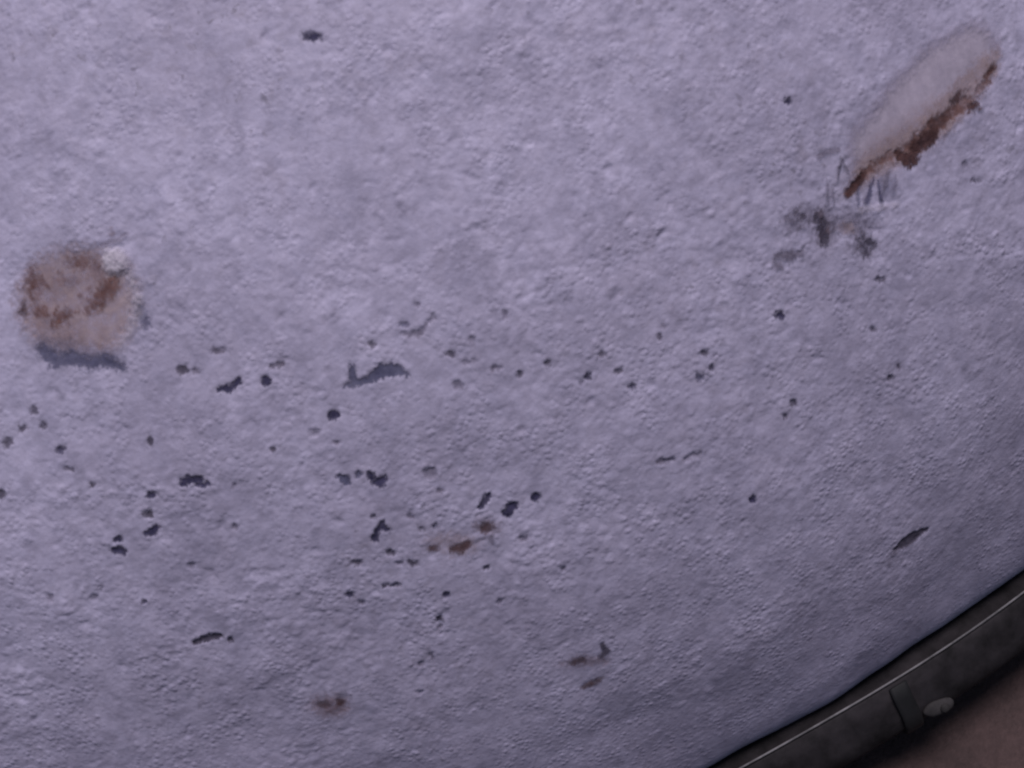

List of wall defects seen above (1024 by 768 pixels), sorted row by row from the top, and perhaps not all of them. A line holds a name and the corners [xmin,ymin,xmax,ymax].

peeling [344,362,409,388]
peeling [217,377,242,394]
peeling [180,475,210,488]
peeling [337,470,388,488]
peeling [501,502,518,517]
peeling [371,515,395,556]
spalling [893,528,928,550]
peeling [193,633,233,645]